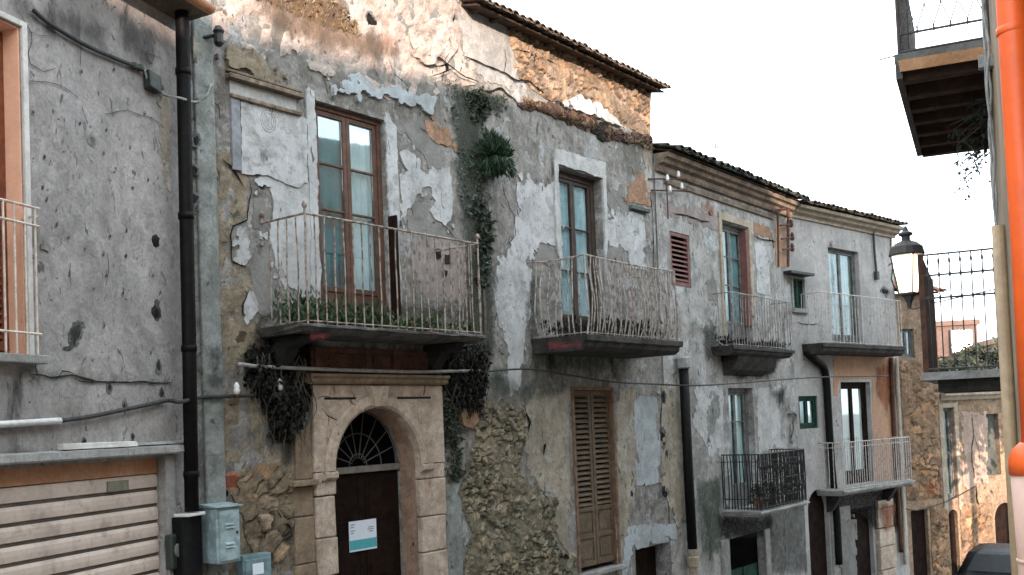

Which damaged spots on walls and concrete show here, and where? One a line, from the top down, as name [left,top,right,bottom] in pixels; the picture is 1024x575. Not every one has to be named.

peeling [212,0,653,152]
crack [389,49,633,148]
peeling [232,175,319,304]
peeling [603,172,652,269]
spalling [62,320,85,351]
peeling [235,291,259,343]
peeling [494,172,571,553]
flaking render [458,408,479,429]
peeling [615,386,678,575]